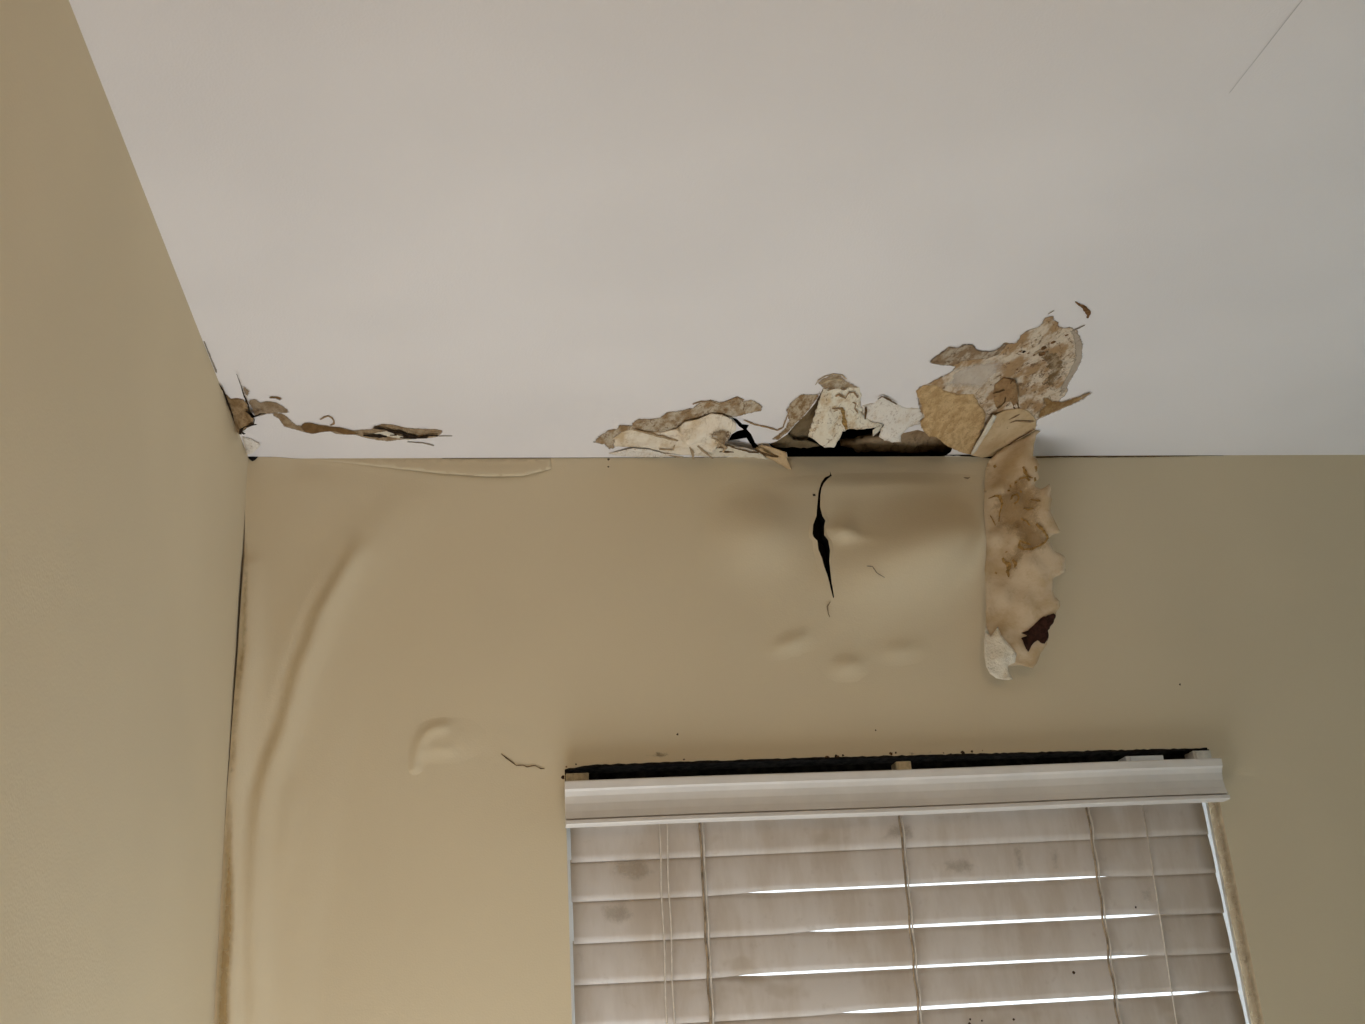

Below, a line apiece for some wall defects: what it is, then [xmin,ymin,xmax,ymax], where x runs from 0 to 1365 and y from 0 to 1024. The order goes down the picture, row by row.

flaking render [729,310,1091,458]
crack [809,473,834,617]